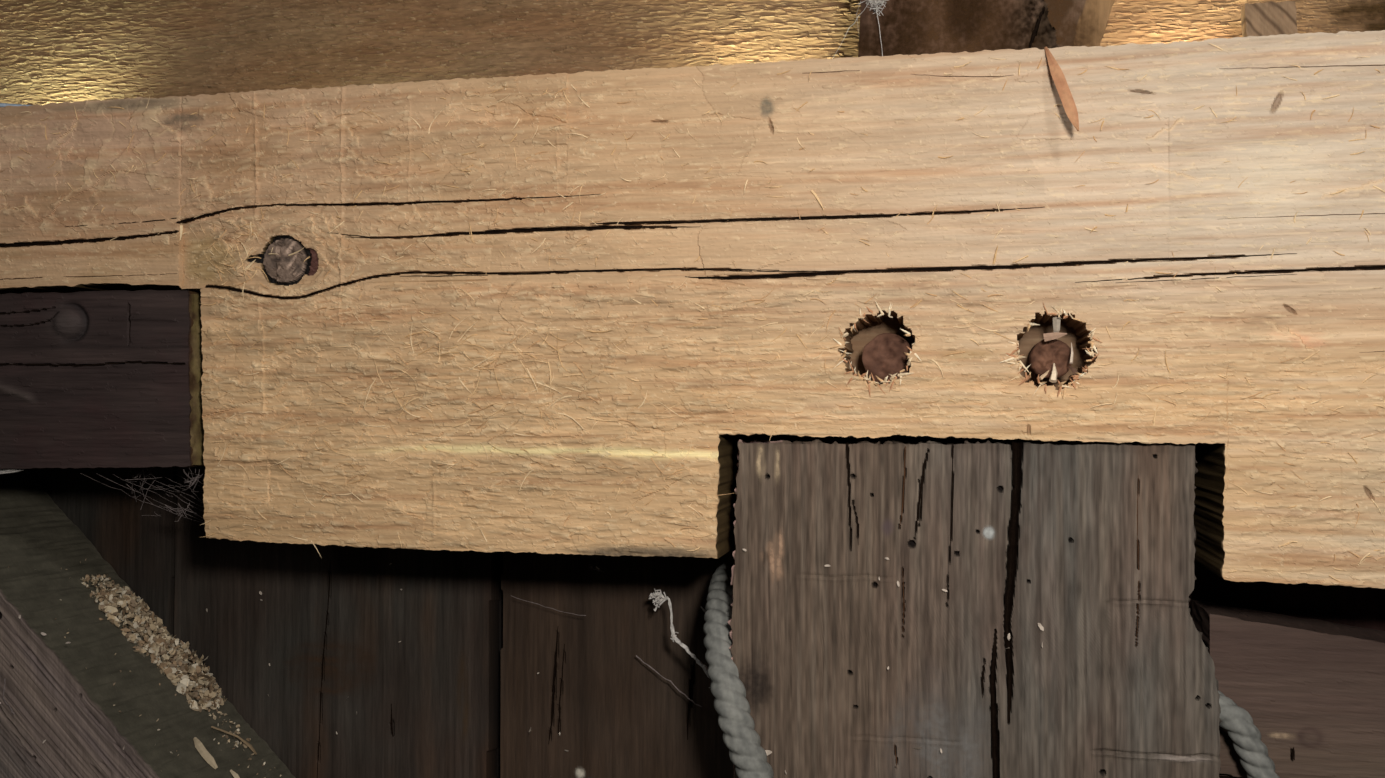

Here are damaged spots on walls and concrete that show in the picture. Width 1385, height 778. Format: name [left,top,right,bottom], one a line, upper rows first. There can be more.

crack [0,194,1385,366]
crack [982,439,1023,778]